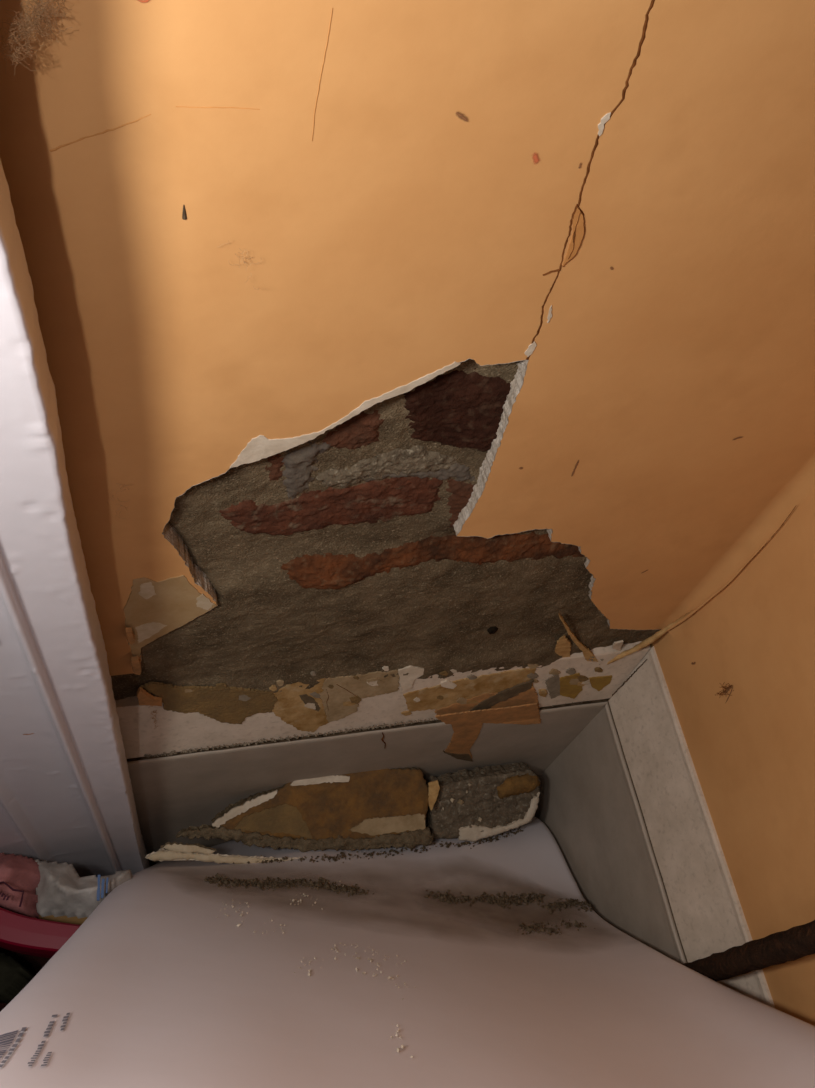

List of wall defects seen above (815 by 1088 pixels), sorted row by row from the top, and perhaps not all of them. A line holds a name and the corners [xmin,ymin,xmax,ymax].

crack [525,0,655,360]
flaking render [111,358,661,762]